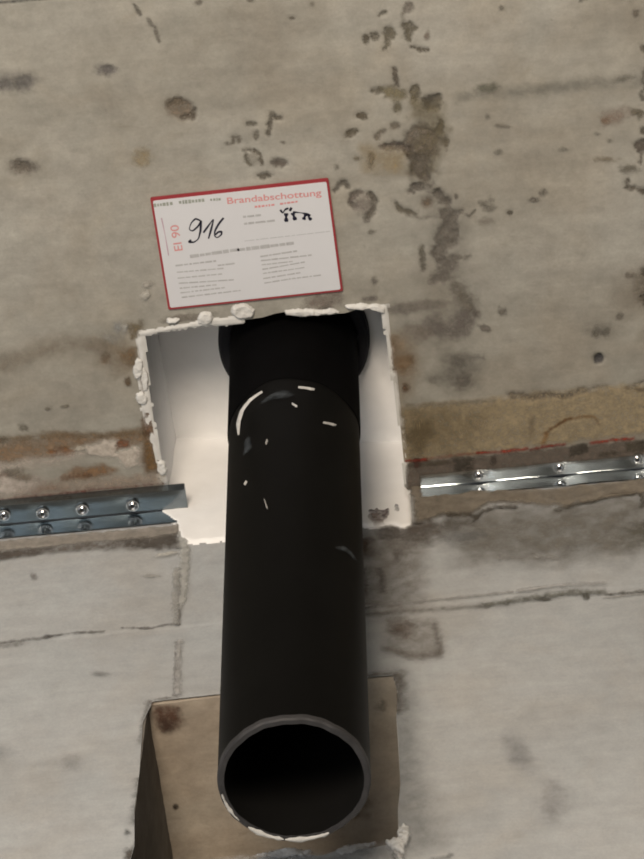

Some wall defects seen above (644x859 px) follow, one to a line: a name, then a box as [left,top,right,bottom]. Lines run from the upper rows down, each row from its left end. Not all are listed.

damp [309,291,340,310]
corrosion [103,324,141,365]
corrosion [0,413,158,472]
corrosion [18,465,114,494]
crack [365,582,644,613]
crack [3,623,179,645]